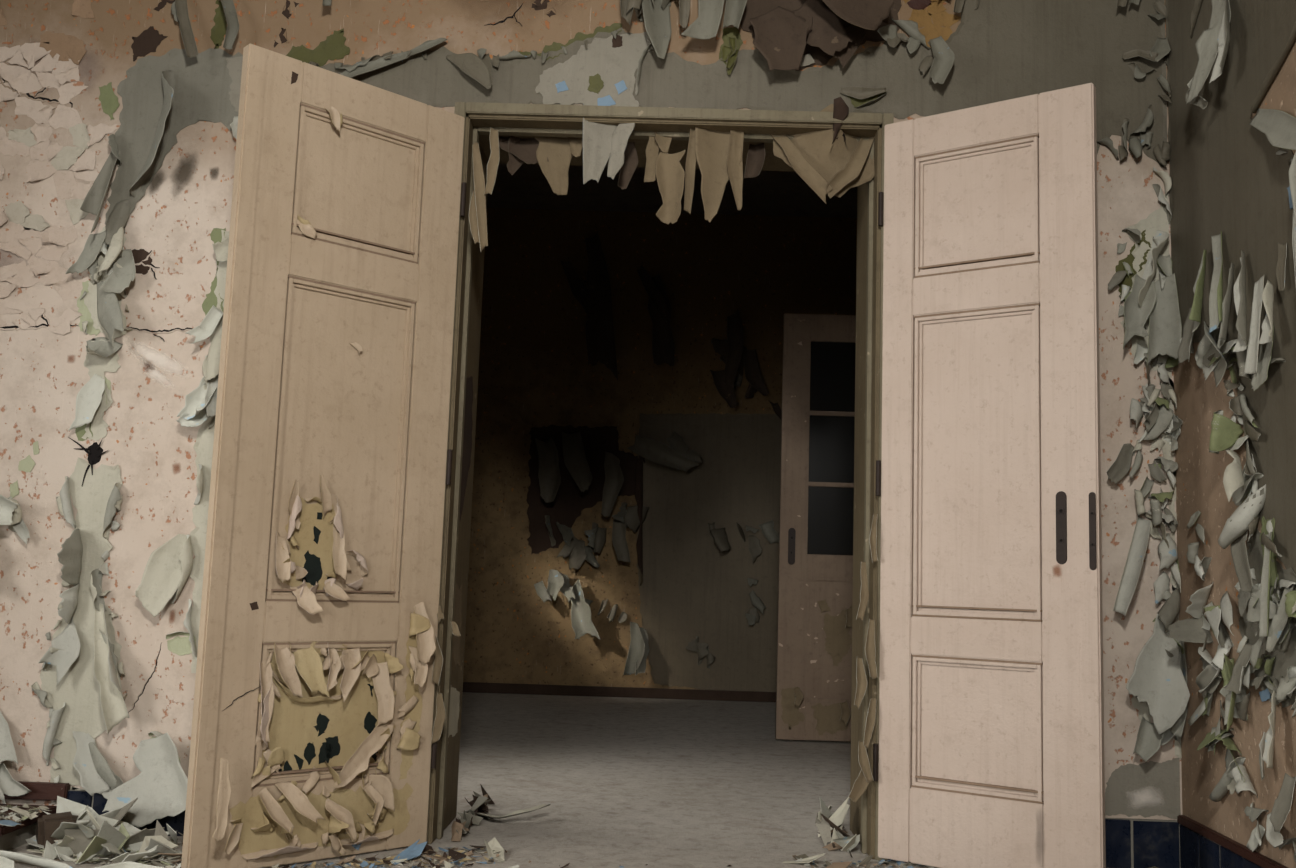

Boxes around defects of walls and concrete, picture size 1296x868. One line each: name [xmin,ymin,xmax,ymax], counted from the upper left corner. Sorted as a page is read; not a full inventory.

spalling [274,0,299,47]
crack [0,78,76,114]
peeling [0,0,243,839]
peeling [309,0,1296,862]
peeling [316,837,504,868]
peeling [783,853,852,868]